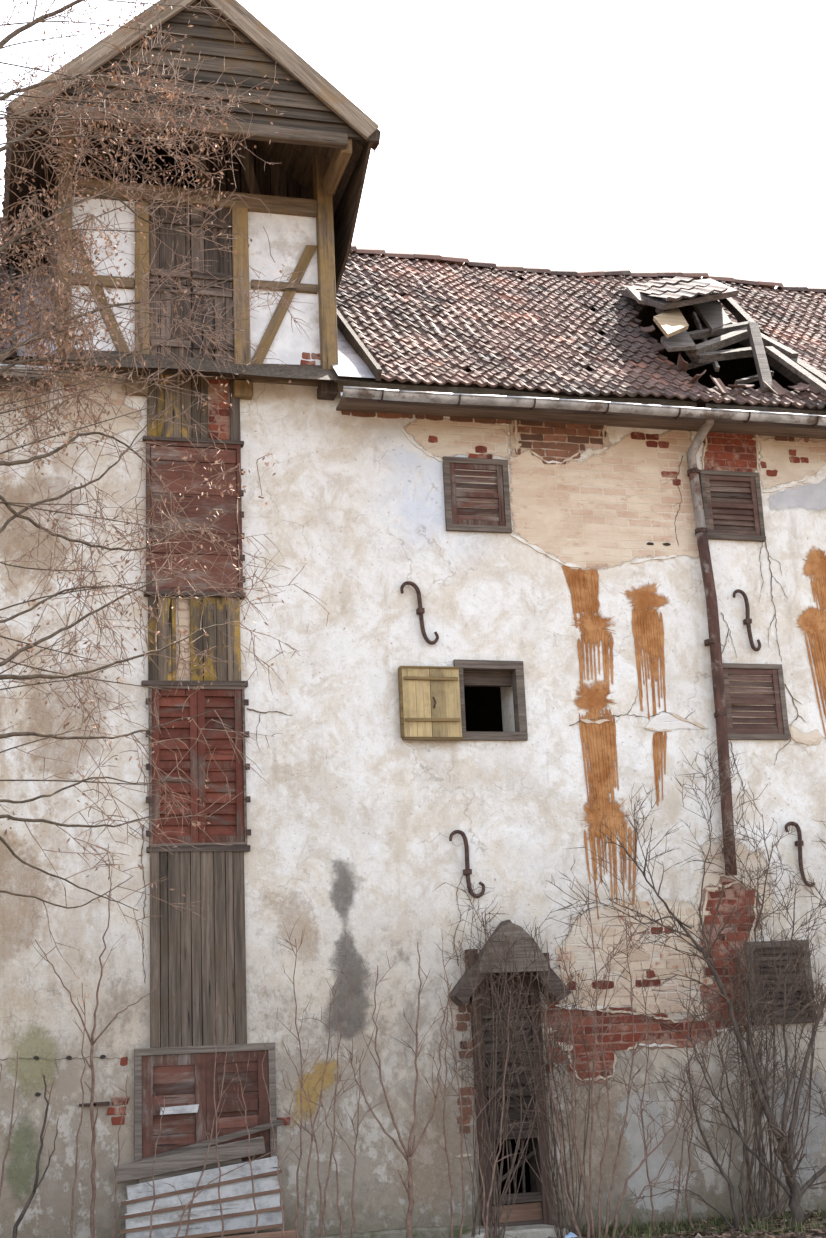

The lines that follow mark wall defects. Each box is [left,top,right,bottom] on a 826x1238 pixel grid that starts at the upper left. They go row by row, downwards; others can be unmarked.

peeling [341,411,826,570]
rust [562,566,637,920]
rust [620,582,668,806]
crack [759,541,807,765]
rust [797,547,826,736]
damp [325,862,369,1037]
peeling [541,835,774,1086]
damp [294,1061,337,1114]